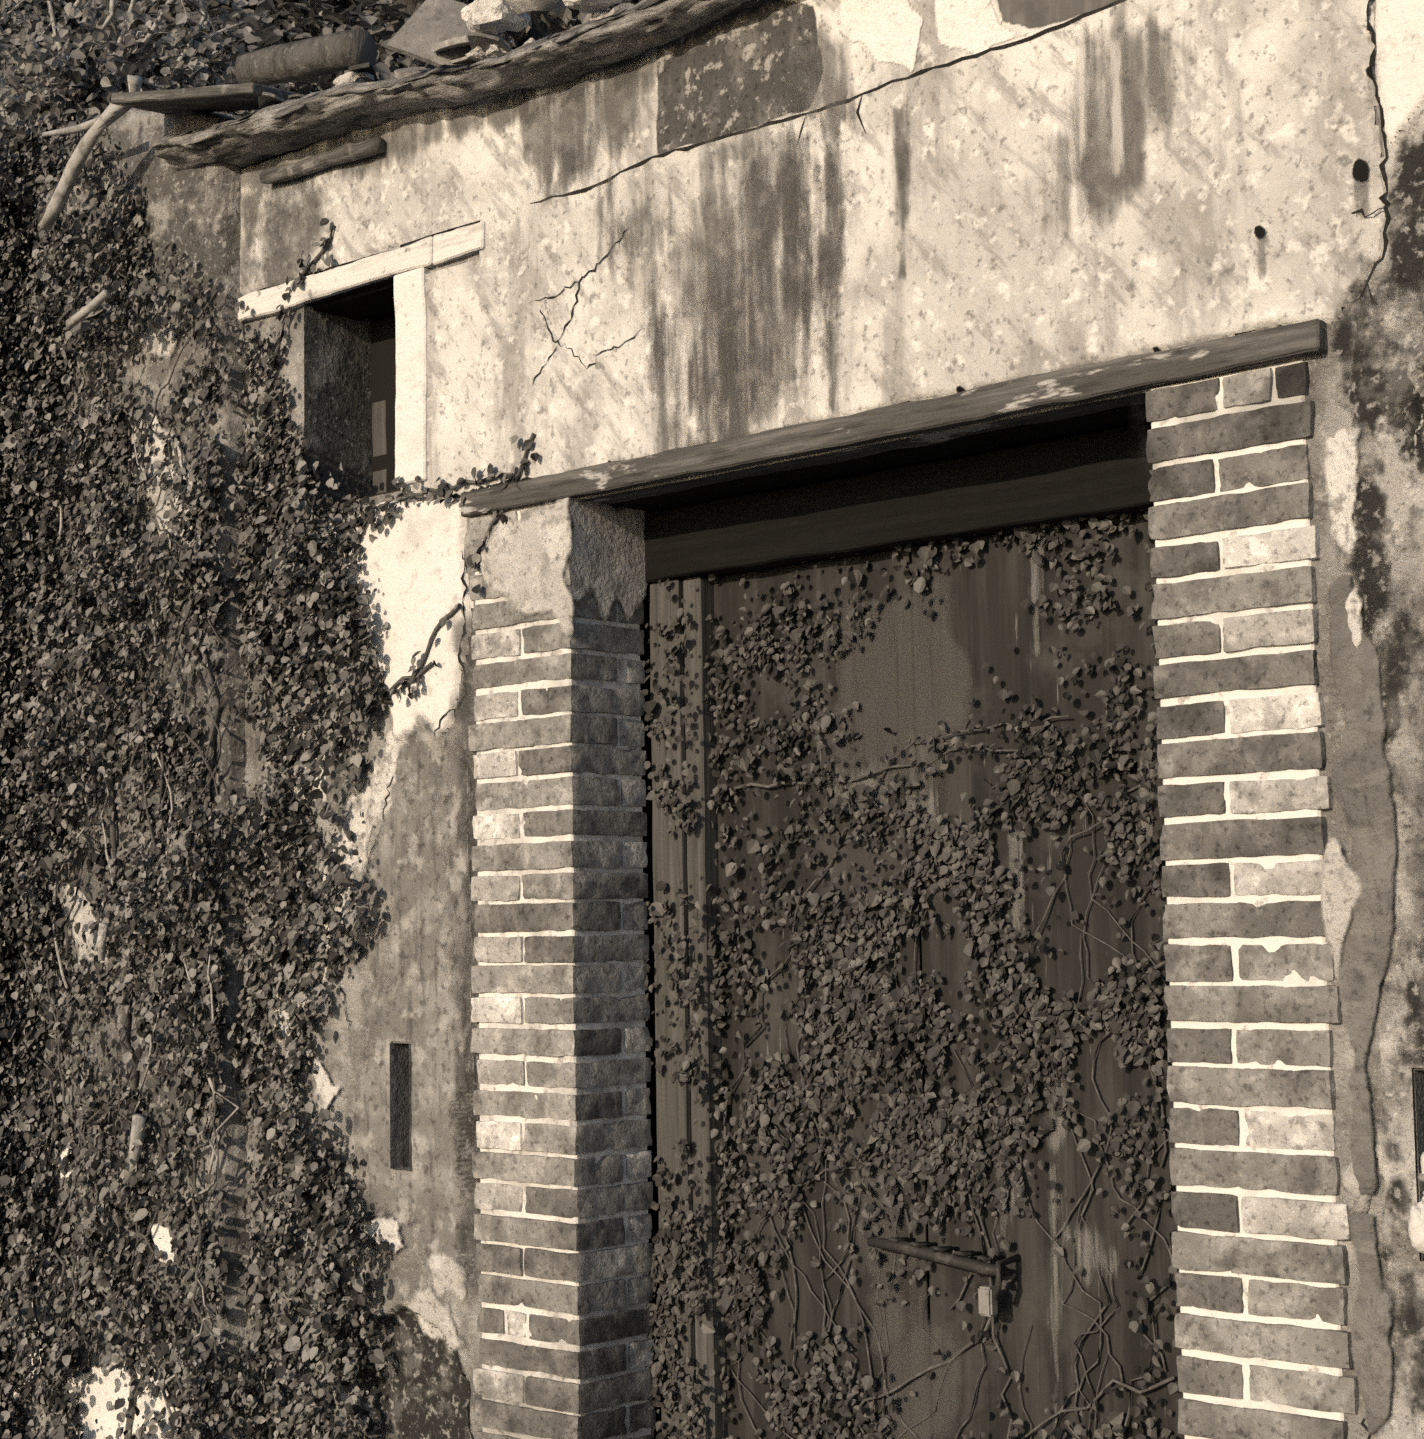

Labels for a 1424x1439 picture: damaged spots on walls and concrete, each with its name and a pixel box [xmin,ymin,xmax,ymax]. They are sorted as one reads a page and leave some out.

water stain [677,39,846,439]
crack [530,0,1125,204]
water stain [895,116,908,227]
water stain [1059,19,1170,221]
crack [1349,0,1391,309]
water stain [1332,134,1424,461]
peeling [480,497,647,635]
water stain [1339,461,1424,743]
peeling [260,710,326,824]
spalling [270,715,481,1439]
water stain [1398,947,1424,1065]
water stain [1397,1272,1424,1411]